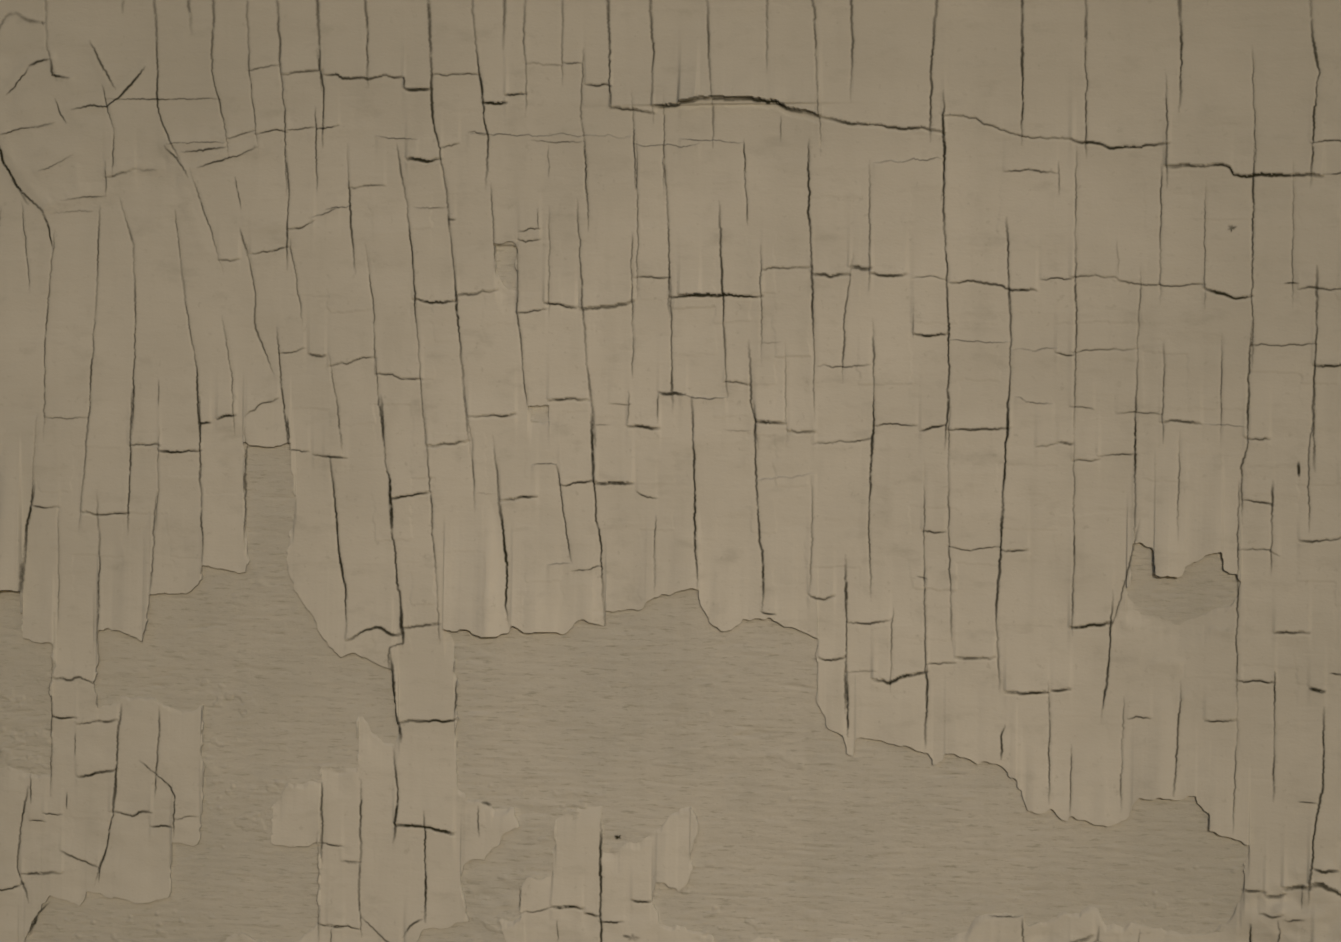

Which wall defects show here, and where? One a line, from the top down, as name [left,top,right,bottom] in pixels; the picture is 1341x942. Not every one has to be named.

crack [212,4,441,294]
peeling [0,513,55,775]
crack [0,677,175,928]
peeling [18,367,399,942]
crack [102,305,335,515]
crack [335,472,457,735]
crack [497,425,656,610]
crack [644,231,777,615]
peeling [406,514,1250,942]
crack [807,33,1078,728]
peeling [1126,451,1241,625]
crack [1160,33,1341,706]